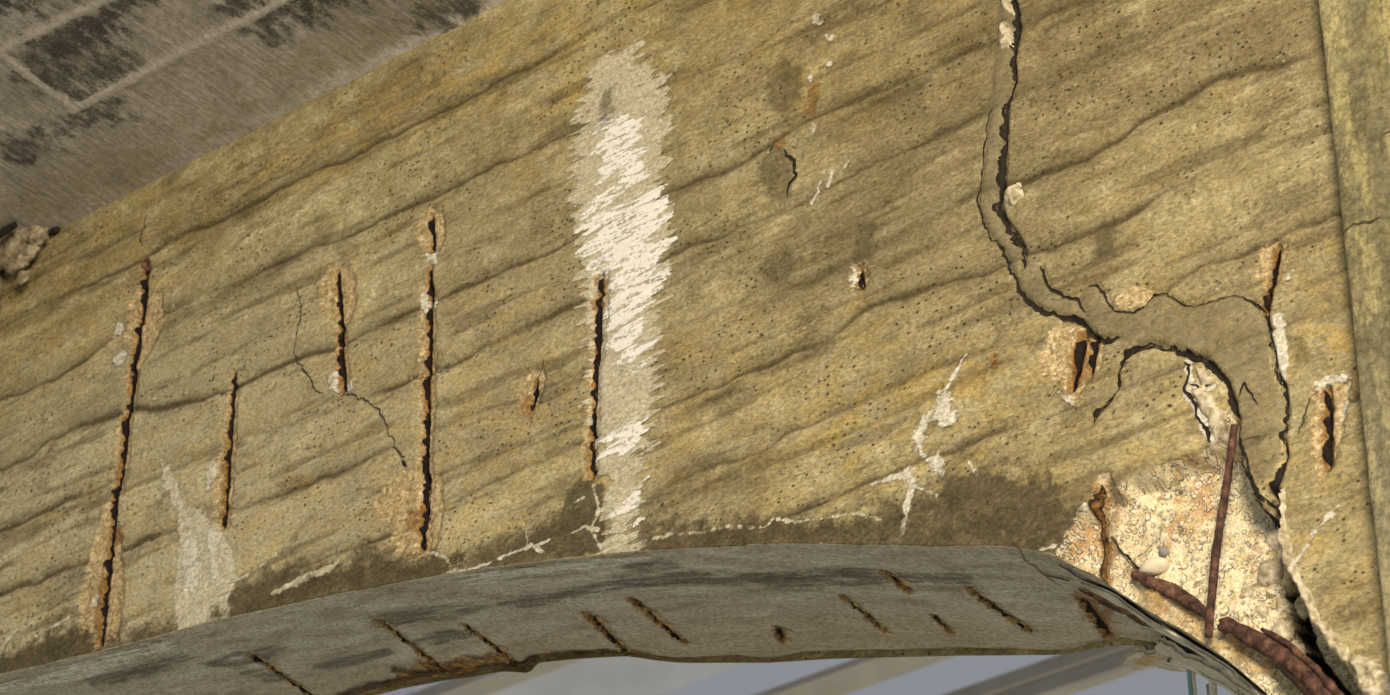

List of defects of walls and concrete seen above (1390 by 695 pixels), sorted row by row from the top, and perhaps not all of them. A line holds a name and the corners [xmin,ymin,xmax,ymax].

water stain [0,0,159,166]
water stain [206,0,371,55]
water stain [408,0,487,36]
crack [976,0,1315,510]
water stain [369,348,1089,647]
spalling [1054,411,1390,695]
corrosion [341,647,673,695]